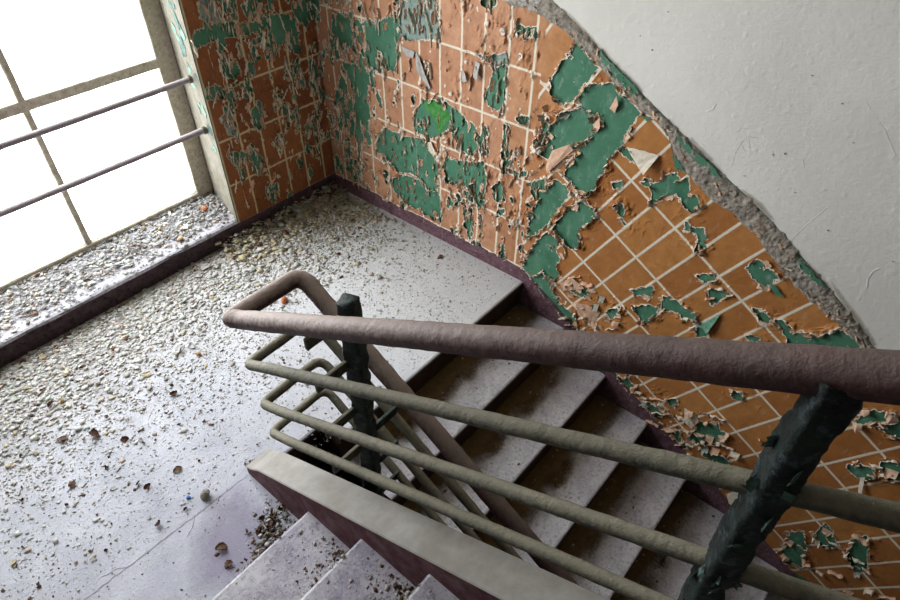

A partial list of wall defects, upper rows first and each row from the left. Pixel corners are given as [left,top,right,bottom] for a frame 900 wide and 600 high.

flaking render [167,0,876,349]
peeling [617,375,740,465]
peeling [852,408,900,436]
peeling [759,435,778,448]
peeling [726,474,760,505]
peeling [847,457,900,494]
peeling [688,564,722,594]
peeling [776,523,896,600]